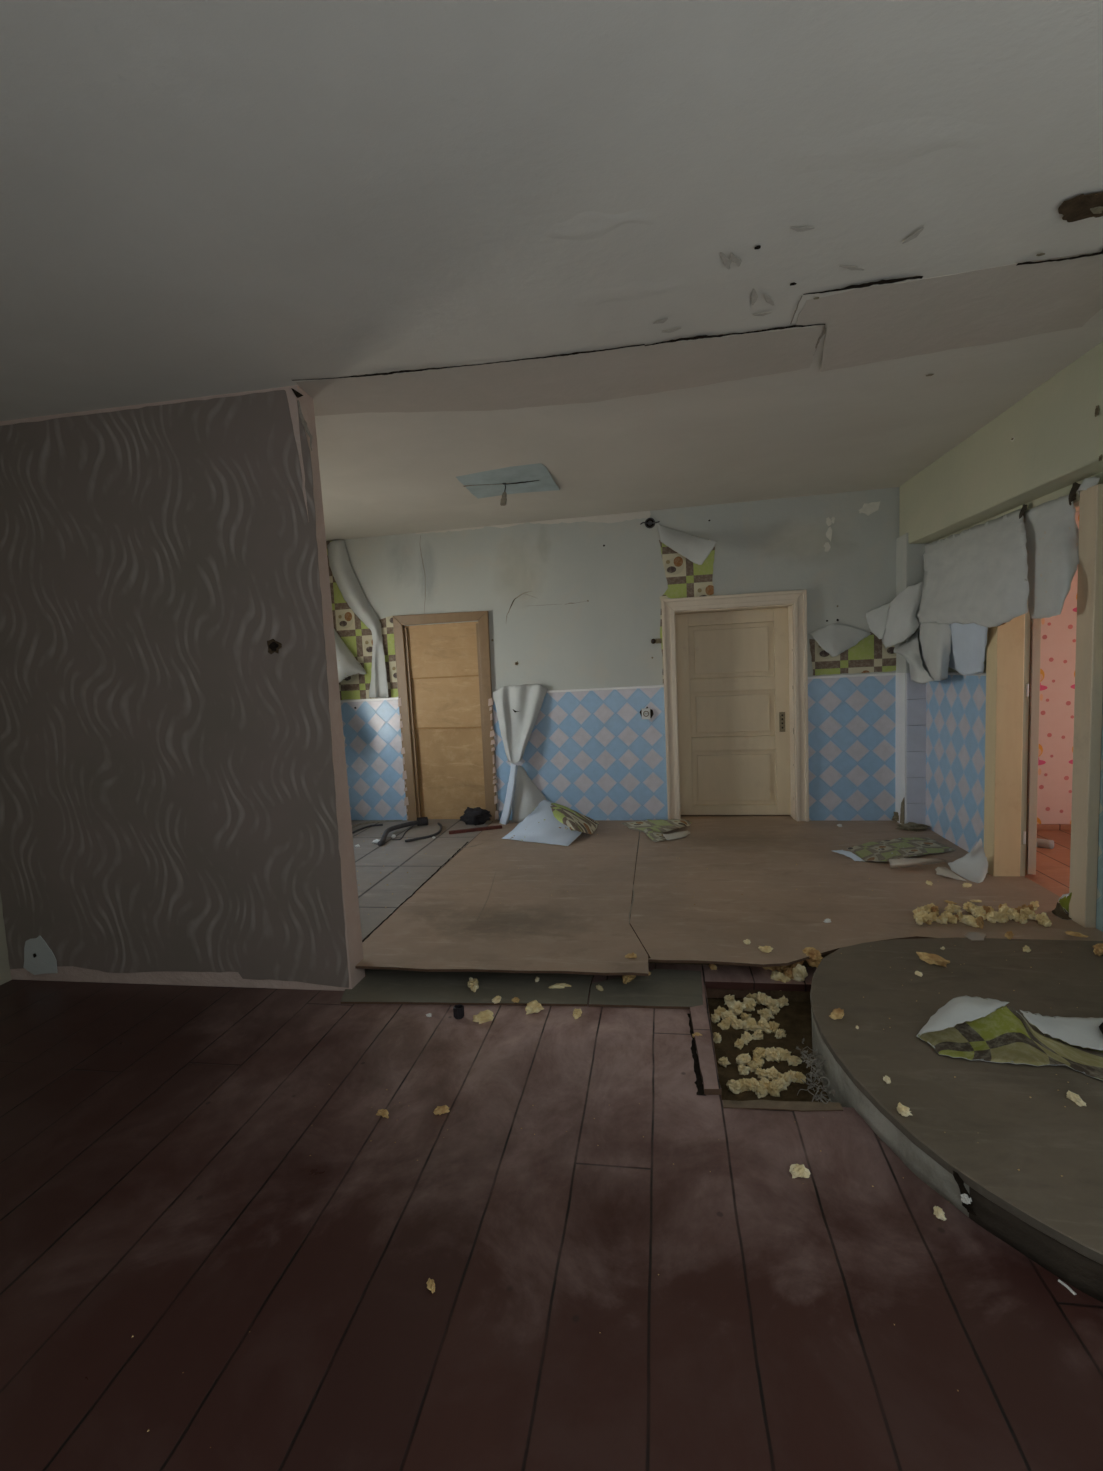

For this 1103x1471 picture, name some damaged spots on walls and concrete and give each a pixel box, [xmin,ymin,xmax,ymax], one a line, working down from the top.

flaking render [1058,192,1103,222]